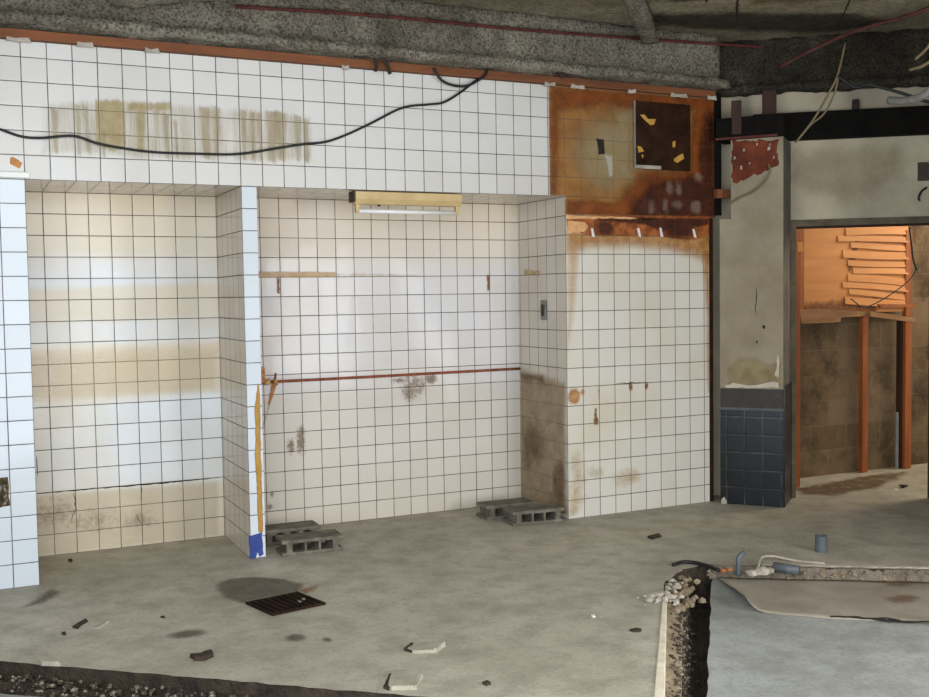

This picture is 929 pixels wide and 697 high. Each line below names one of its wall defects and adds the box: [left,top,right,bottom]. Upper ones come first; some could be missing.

water stain [653,0,885,33]
water stain [97,101,166,150]
rust [549,86,714,316]
water stain [396,375,435,399]
rust [569,389,584,404]
water stain [521,374,565,513]